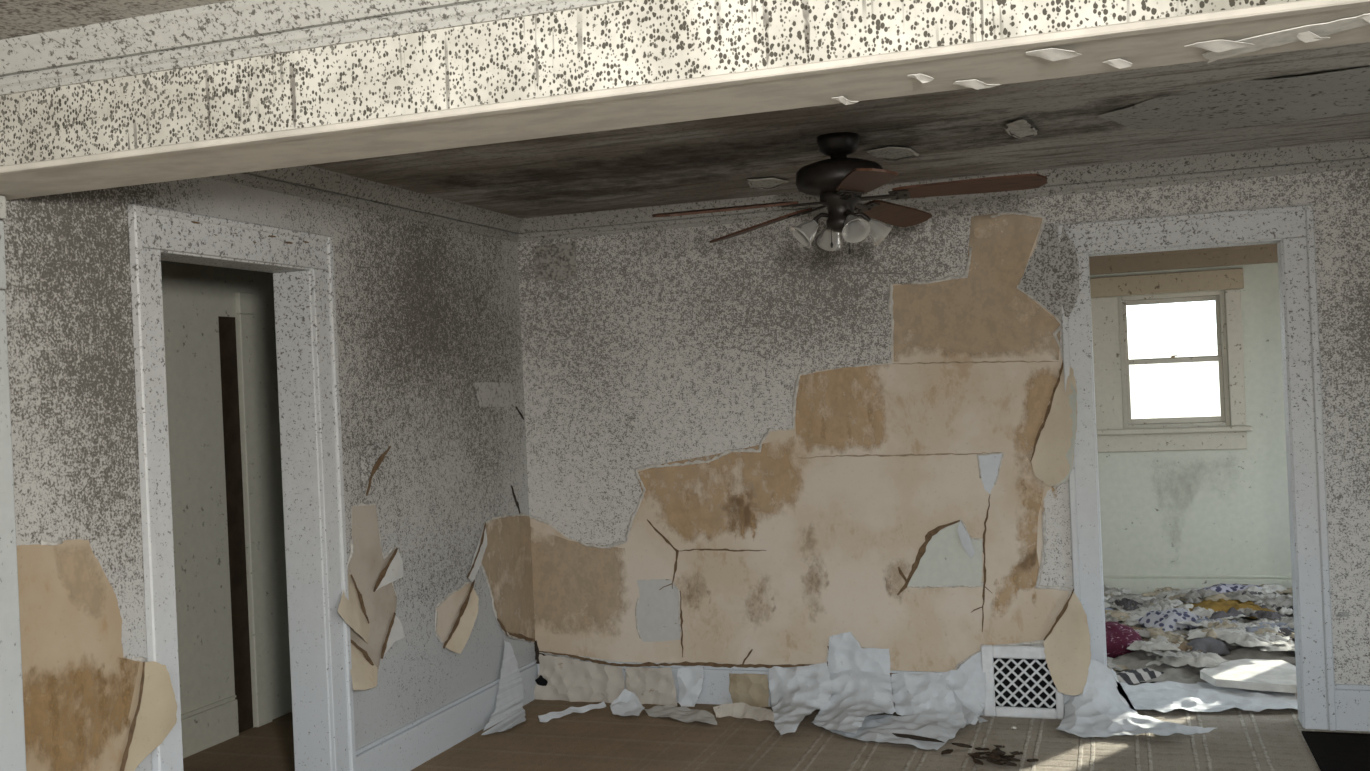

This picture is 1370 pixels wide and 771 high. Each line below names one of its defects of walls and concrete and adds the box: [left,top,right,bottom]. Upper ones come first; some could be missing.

damp [23,658,136,771]
peeling [17,537,177,771]
peeling [337,443,405,690]
peeling [435,210,1091,695]